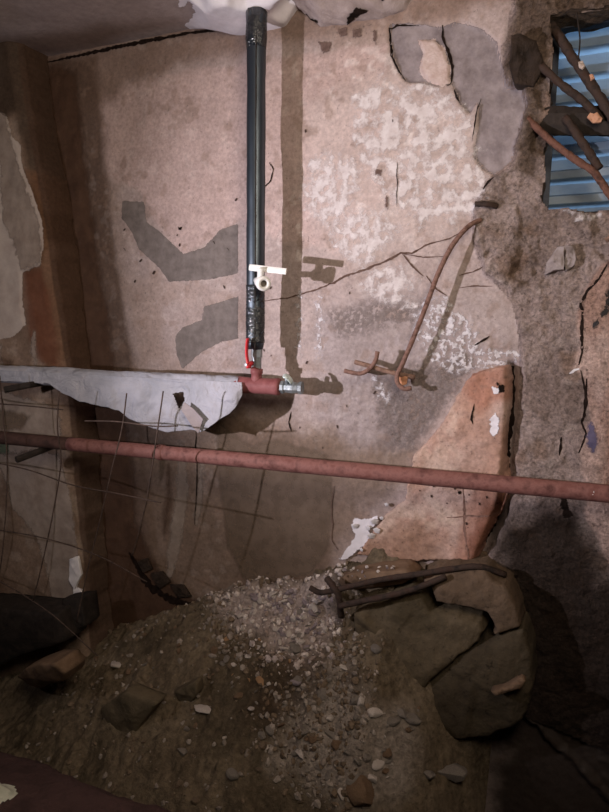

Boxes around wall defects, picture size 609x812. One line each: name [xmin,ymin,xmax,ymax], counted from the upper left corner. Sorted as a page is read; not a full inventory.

corrosion [587,112,603,124]
peeling [0,113,44,340]
crack [265,234,489,301]
peeling [0,391,61,437]
spalling [178,0,609,752]
peeling [0,445,83,598]